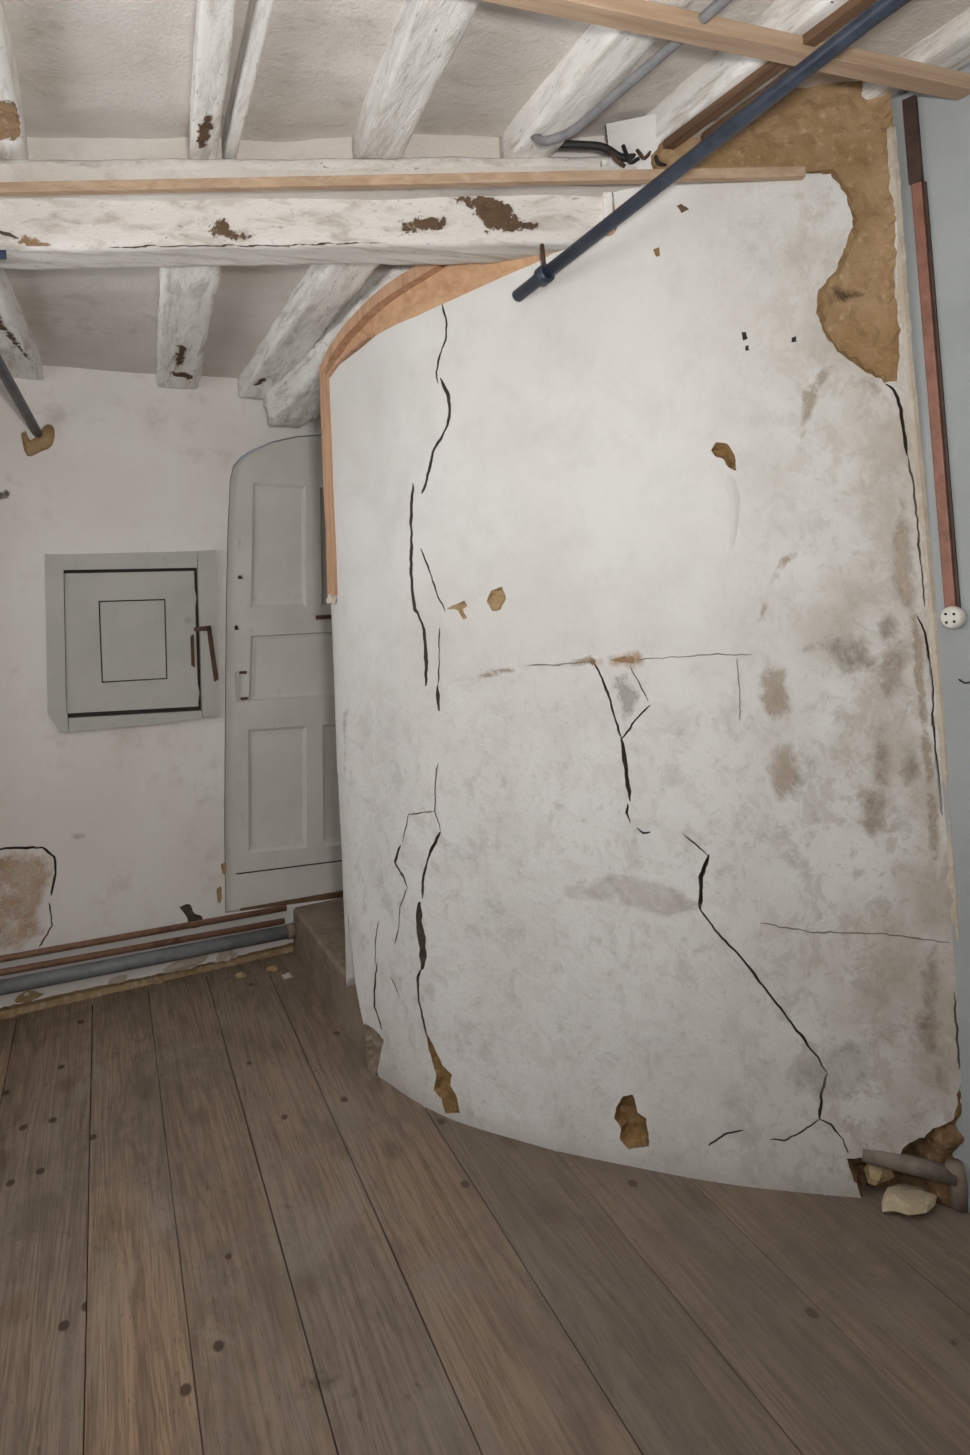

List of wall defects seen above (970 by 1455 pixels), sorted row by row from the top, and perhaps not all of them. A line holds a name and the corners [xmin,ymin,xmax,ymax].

peeling [401,196,539,234]
spalling [651,81,901,383]
spalling [711,442,736,470]
crack [409,304,451,711]
crack [885,384,943,814]
crack [373,765,441,1040]
crack [529,653,849,1152]
crack [762,923,950,943]
spalling [425,1029,460,1114]
crack [953,992,961,1069]
spalling [614,1095,649,1149]
spalling [902,1085,964,1163]